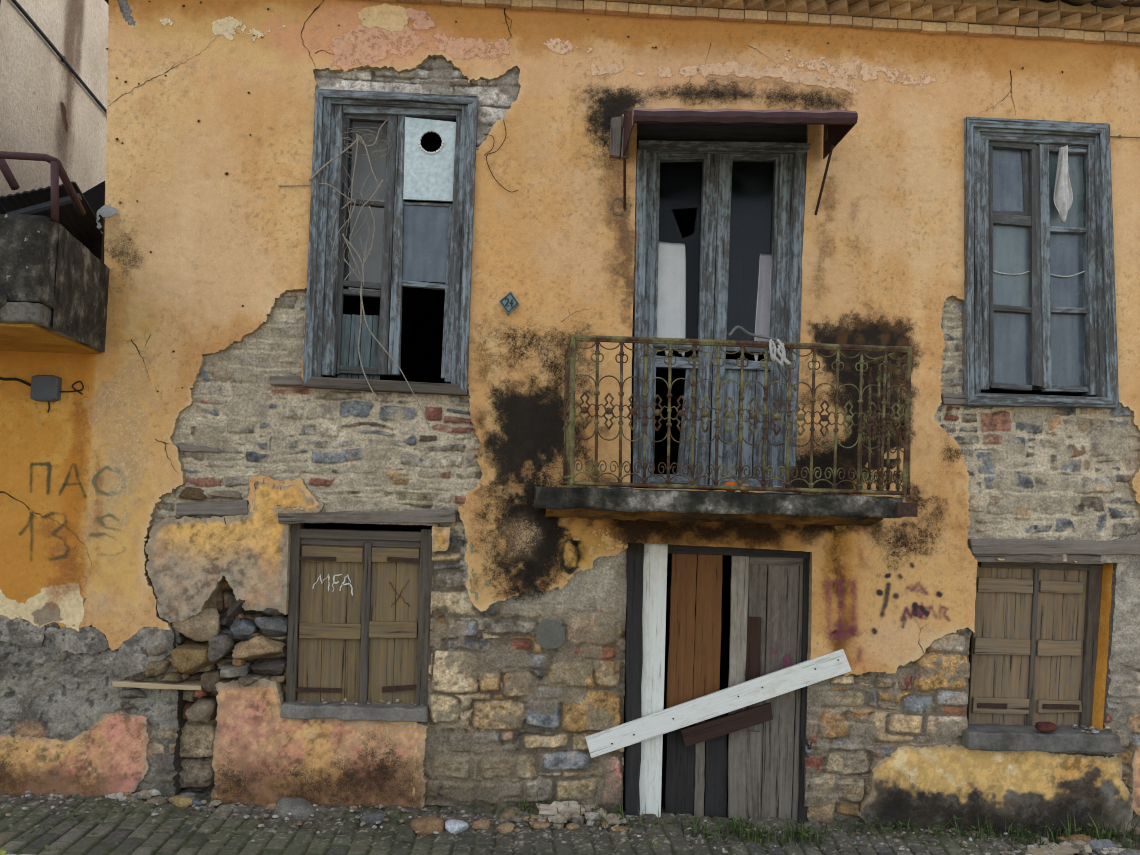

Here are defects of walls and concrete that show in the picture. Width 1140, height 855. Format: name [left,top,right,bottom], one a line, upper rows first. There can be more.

crack [301,0,342,71]
spalling [314,3,520,150]
damp [577,80,853,323]
crack [0,491,92,603]
spalling [149,290,627,812]
damp [468,323,614,602]
damp [610,485,946,570]
damp [785,307,923,495]
spalling [934,296,1140,787]
spalling [0,580,288,797]
spalling [804,628,972,825]
damp [862,779,1114,837]